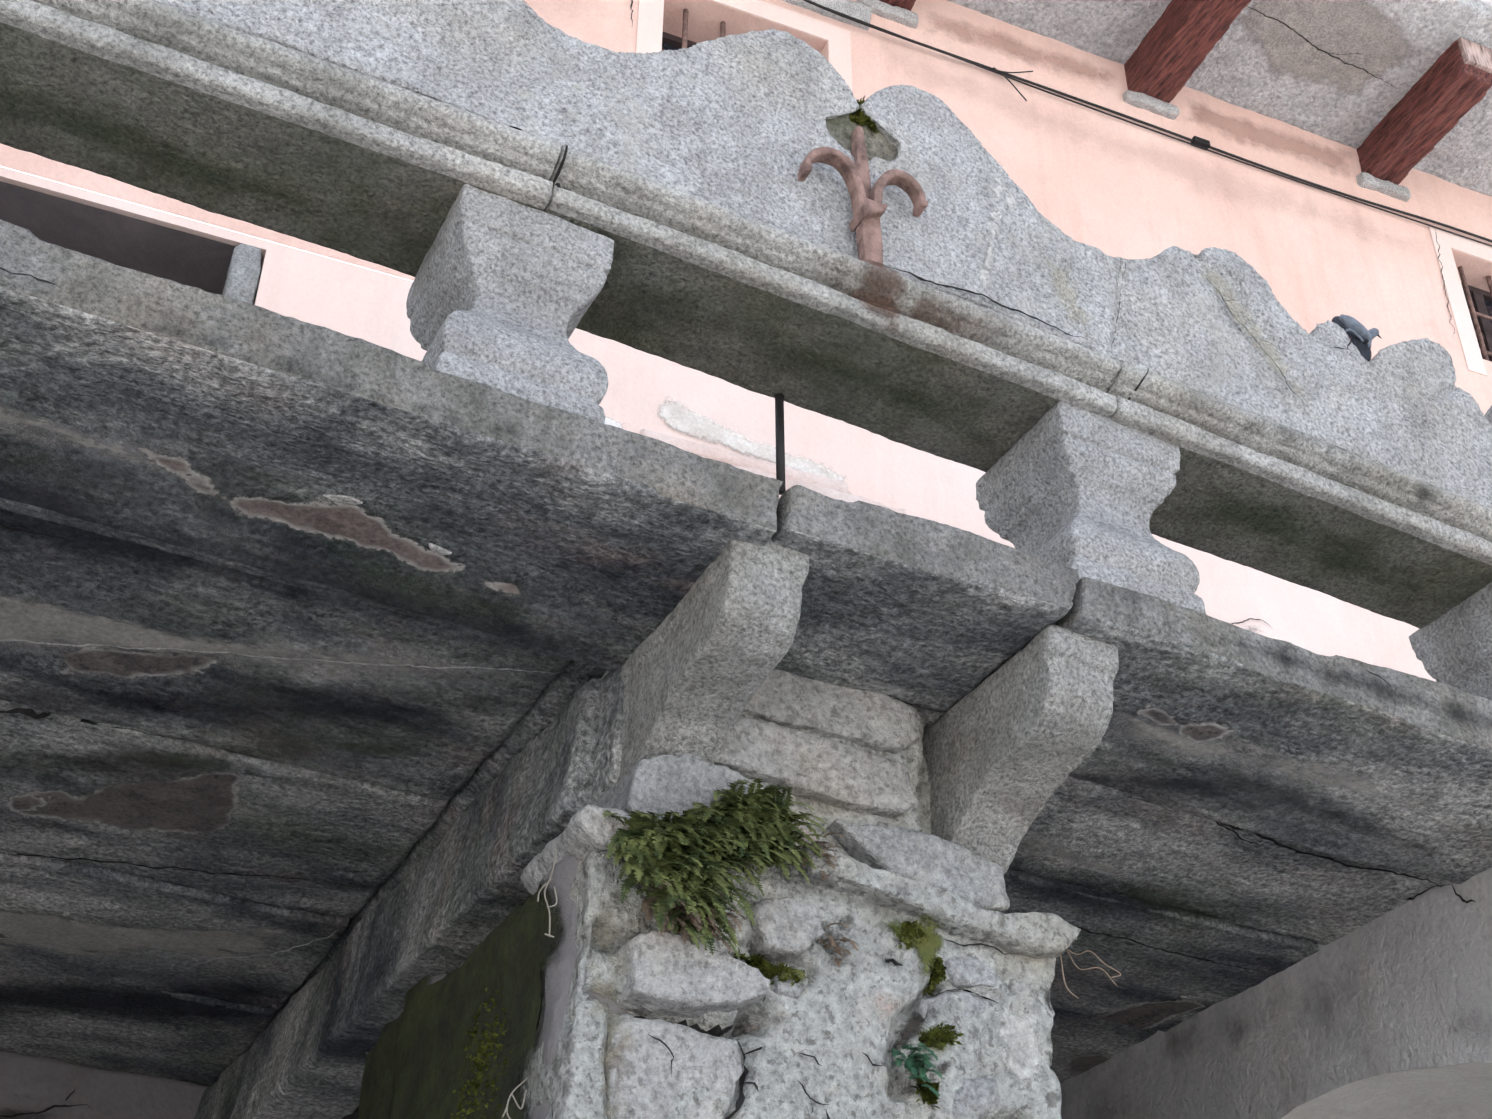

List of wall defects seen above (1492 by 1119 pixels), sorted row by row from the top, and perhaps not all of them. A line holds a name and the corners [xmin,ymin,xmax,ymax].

crack [1249,7,1396,88]
rust [850,263,904,325]
peeling [137,447,466,573]
peeling [482,580,524,596]
peeling [59,646,217,679]
crack [1213,820,1476,903]